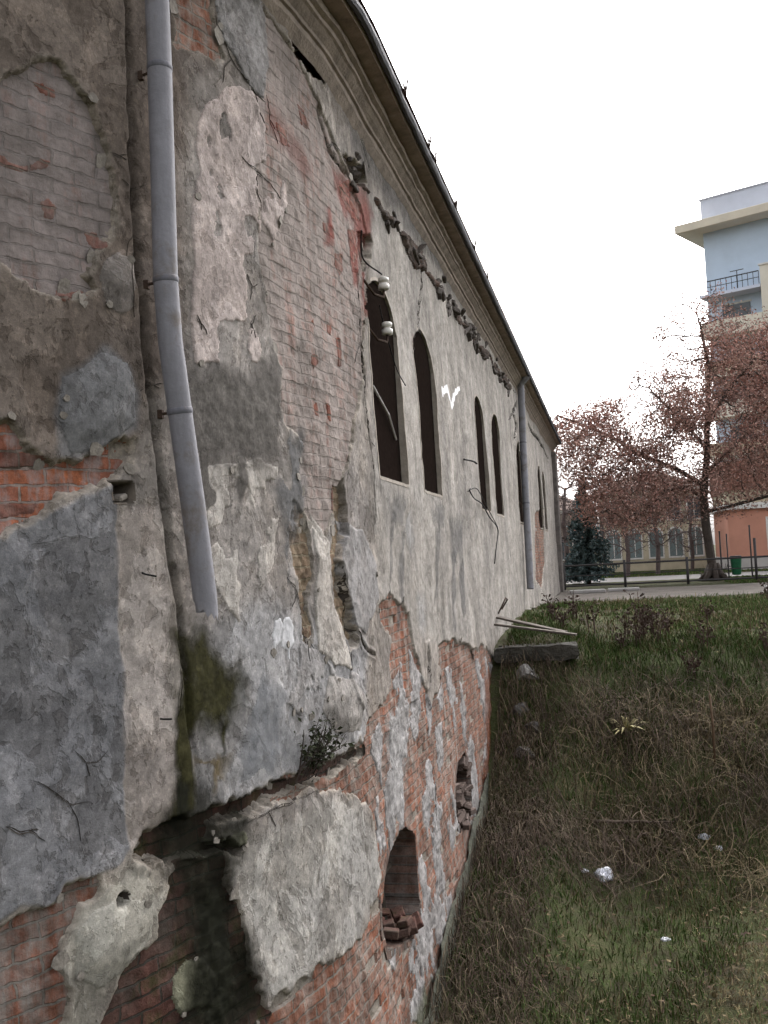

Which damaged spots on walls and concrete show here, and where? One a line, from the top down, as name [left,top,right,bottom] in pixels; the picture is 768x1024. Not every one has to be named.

flaking render [0,61,113,308]
flaking render [0,411,136,534]
flaking render [169,0,493,1024]
crack [7,826,45,841]
flaking render [0,876,99,1024]
crack [38,781,89,841]
flaking render [101,828,198,1024]
leakage [154,628,260,1024]